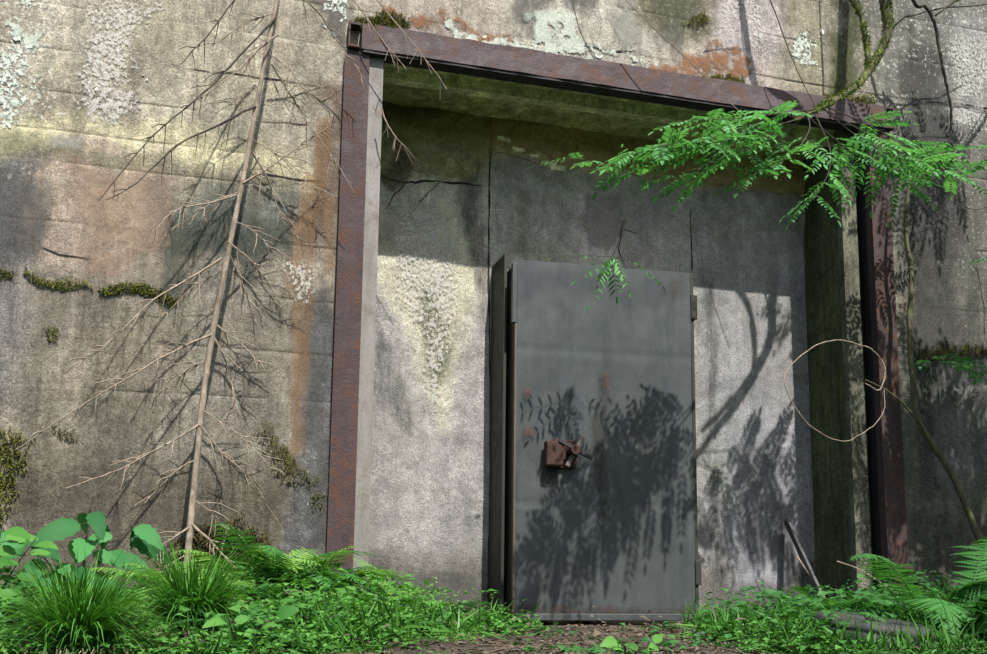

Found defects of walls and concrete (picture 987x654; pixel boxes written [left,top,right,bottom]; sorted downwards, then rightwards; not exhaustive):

water stain [0,20,46,128]
water stain [76,0,171,125]
rust [650,39,752,78]
water stain [164,208,290,302]
water stain [276,262,323,303]
crack [382,118,539,485]
water stain [902,31,987,421]